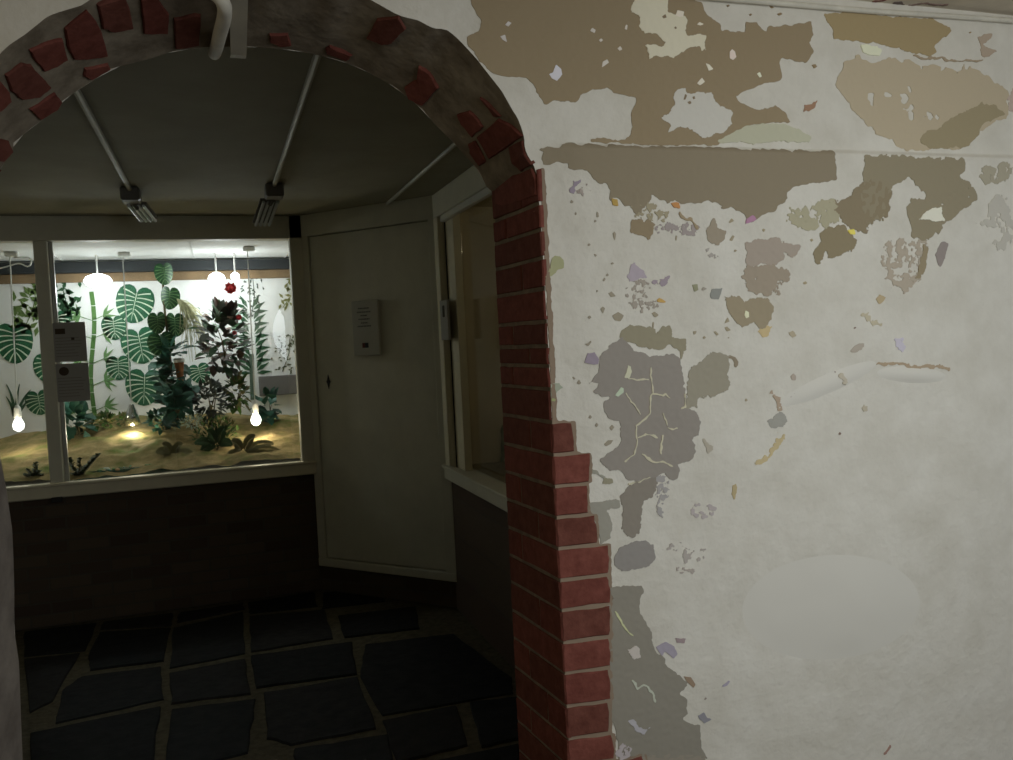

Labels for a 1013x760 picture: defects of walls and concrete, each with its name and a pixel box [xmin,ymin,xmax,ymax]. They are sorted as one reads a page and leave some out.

peeling [467,0,978,574]
crack [624,367,686,485]
peeling [605,585,711,760]